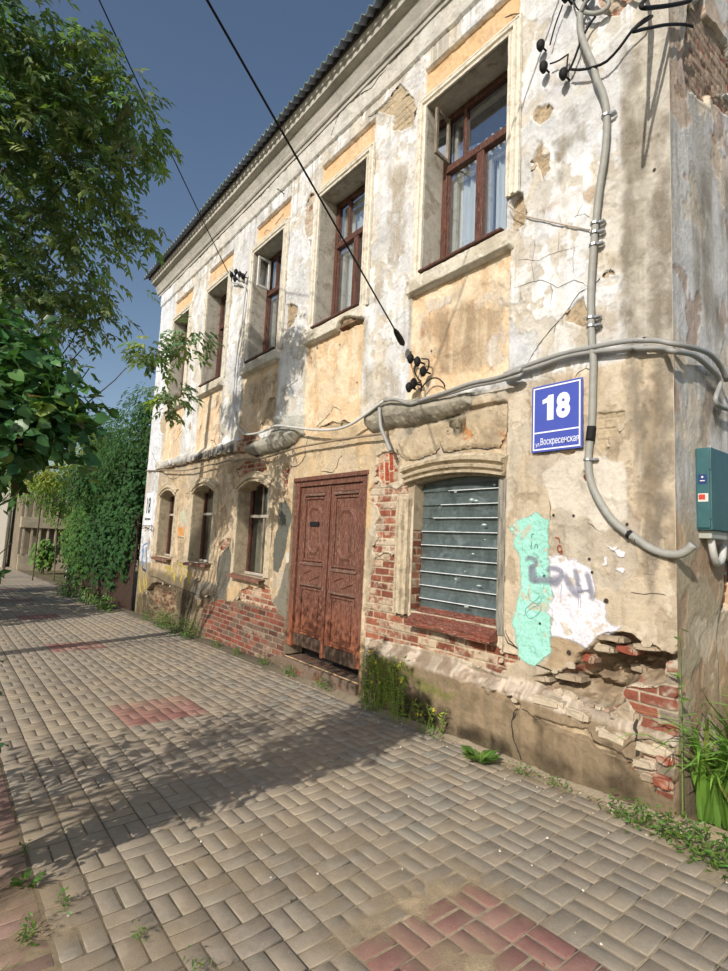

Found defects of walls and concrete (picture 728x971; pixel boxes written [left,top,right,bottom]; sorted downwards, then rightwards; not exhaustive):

spalling [599,0,632,16]
spalling [371,85,418,131]
spalling [533,102,553,124]
spalling [530,144,550,179]
spalling [364,452,518,673]
spalling [146,582,178,614]
spalling [200,585,284,658]
crack [511,708,538,760]
spalling [530,632,683,800]